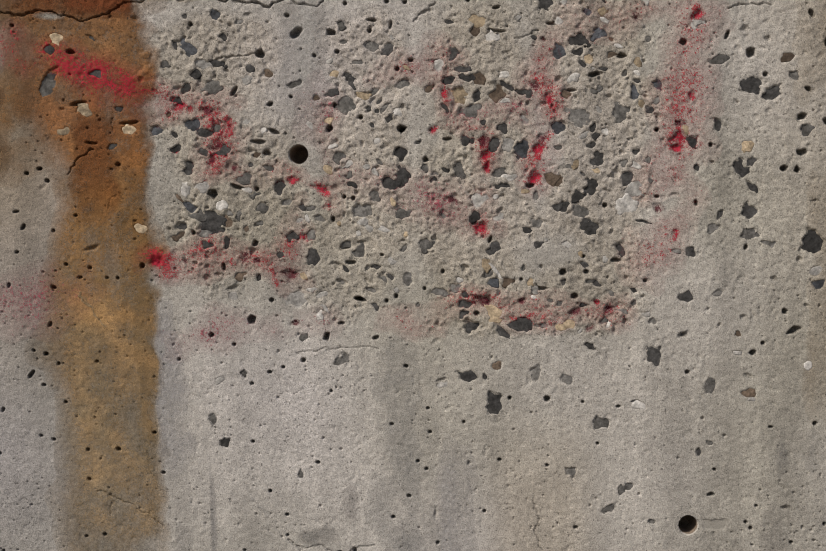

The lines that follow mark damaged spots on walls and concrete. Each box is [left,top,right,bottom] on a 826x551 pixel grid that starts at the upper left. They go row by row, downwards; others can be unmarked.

crack [218,0,324,8]
crack [413,3,436,22]
rust [5,0,165,551]
crack [289,539,375,551]